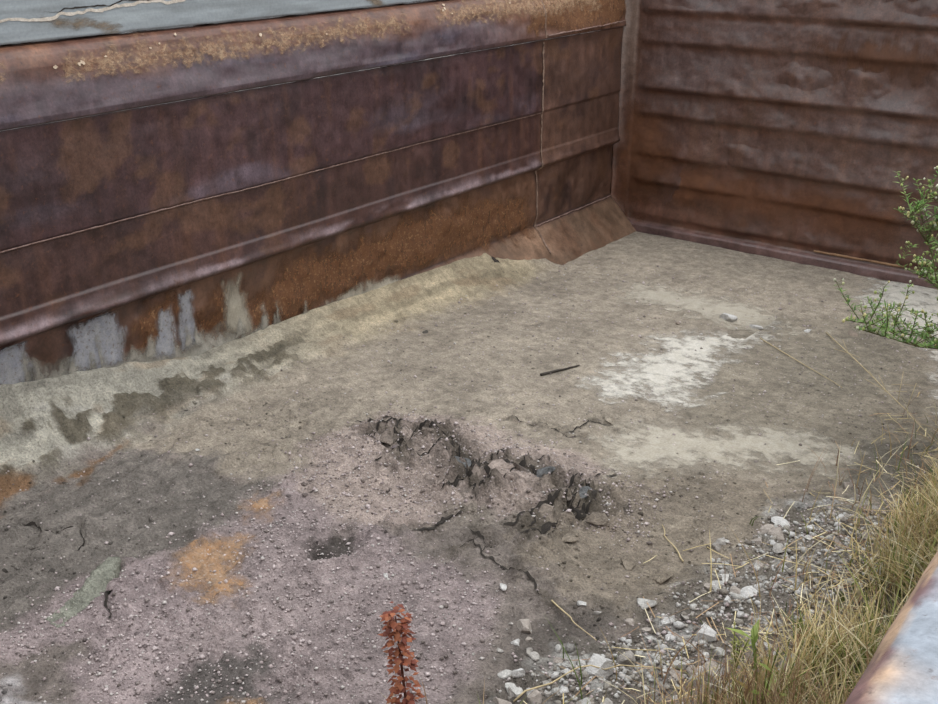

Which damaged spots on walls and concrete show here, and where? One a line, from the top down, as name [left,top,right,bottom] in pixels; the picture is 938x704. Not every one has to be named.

crack [0,0,186,23]
corrosion [528,0,626,35]
corrosion [818,35,938,83]
corrosion [193,196,532,348]
corrosion [130,293,182,357]
crack [357,415,547,489]
crack [515,416,610,438]
crack [413,473,616,595]